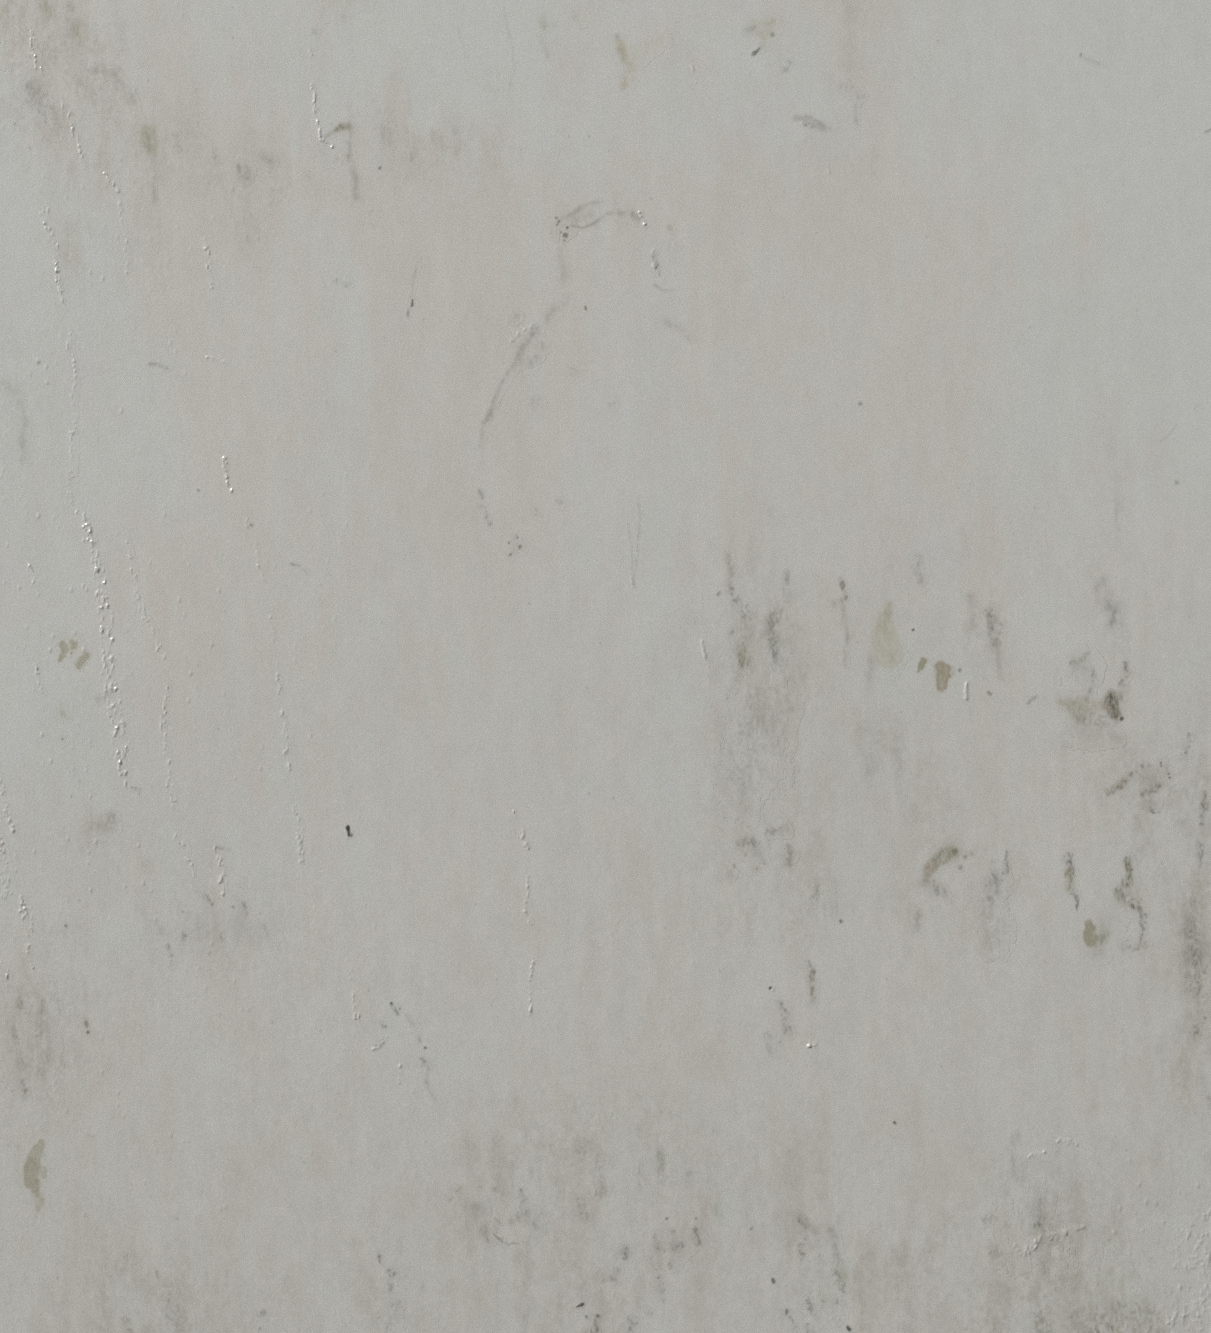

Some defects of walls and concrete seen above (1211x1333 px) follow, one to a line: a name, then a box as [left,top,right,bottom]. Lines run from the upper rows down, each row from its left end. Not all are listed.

leakage [828,574,956,696]
leakage [960,587,1011,686]
leakage [711,549,805,882]
leakage [1050,642,1194,814]
leakage [758,957,821,1059]
leakage [909,835,1016,963]
leakage [1059,787,1211,1117]